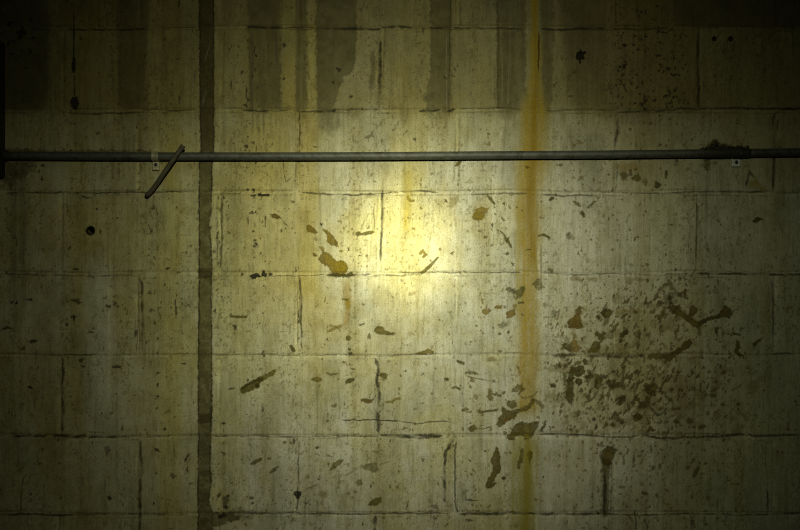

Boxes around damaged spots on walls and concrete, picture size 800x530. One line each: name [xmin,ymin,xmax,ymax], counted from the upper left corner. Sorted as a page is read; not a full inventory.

leakage [316,0,357,112]
rust [516,0,544,412]
crack [343,361,553,515]
leakage [600,444,616,516]